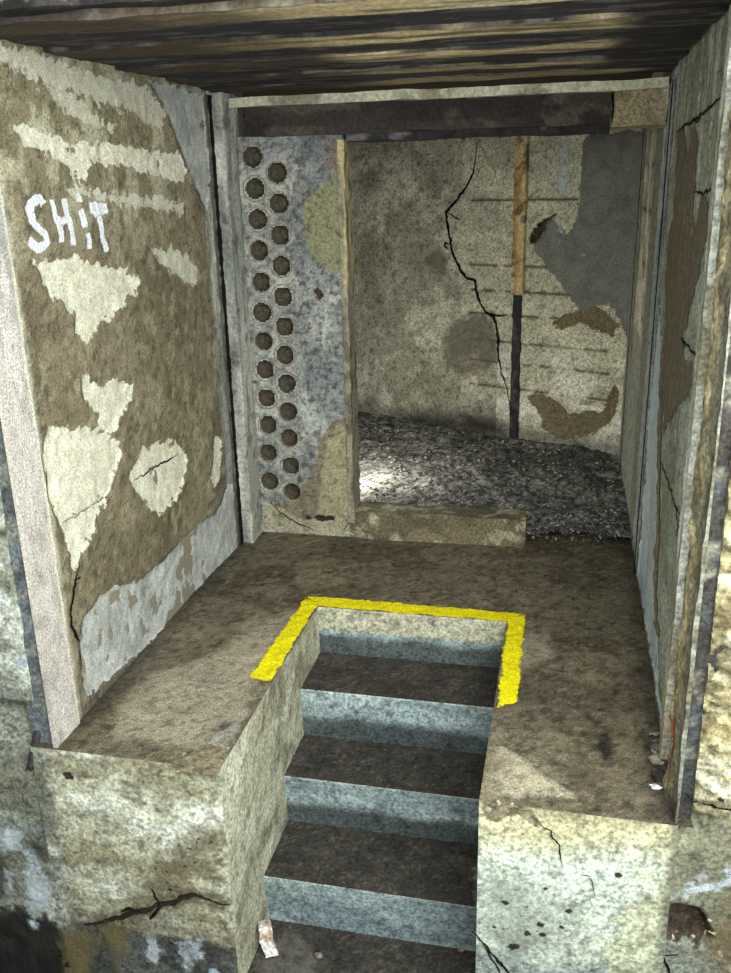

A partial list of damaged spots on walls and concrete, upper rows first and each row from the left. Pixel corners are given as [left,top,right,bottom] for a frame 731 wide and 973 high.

flaking render [0,42,211,217]
crack [676,96,721,133]
flaking render [32,253,140,345]
crack [444,144,510,406]
spalling [528,384,619,440]
flaking render [42,373,133,572]
peeling [78,436,238,696]
crack [686,795,731,811]
leakage [0,828,91,973]
crack [83,888,230,926]
crack [472,931,509,973]
spalling [666,903,731,973]